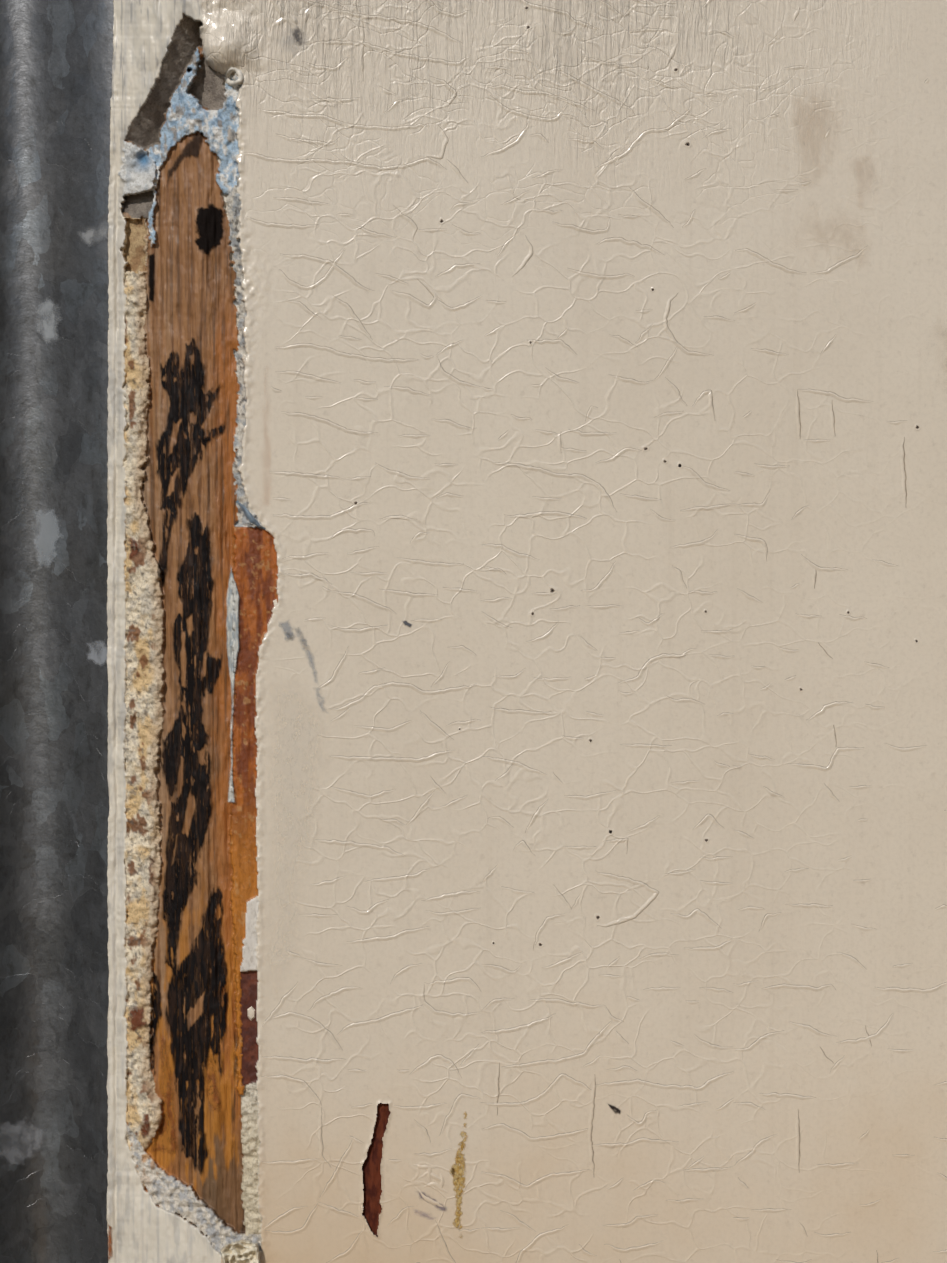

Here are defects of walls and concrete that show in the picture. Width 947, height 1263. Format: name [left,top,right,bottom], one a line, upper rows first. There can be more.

peeling [119,14,278,1263]
peeling [362,1103,391,1237]
crack [241,0,947,1263]